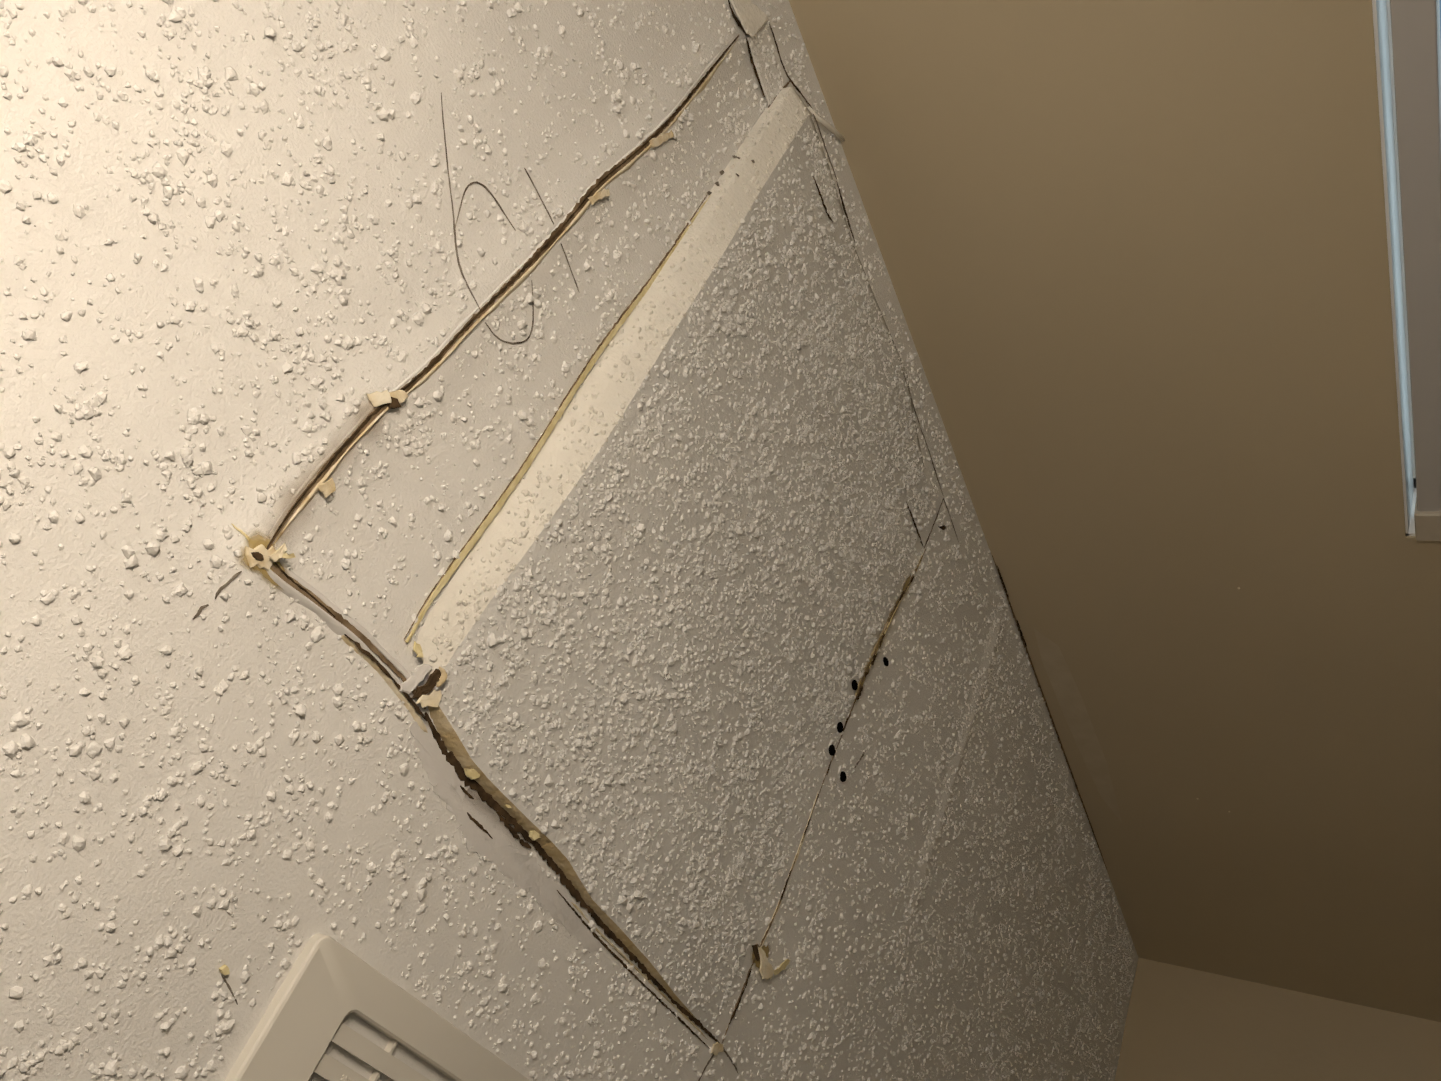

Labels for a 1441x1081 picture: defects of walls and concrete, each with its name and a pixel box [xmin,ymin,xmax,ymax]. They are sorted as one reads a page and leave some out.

crack [193,23,959,1081]
crack [992,555,1107,869]